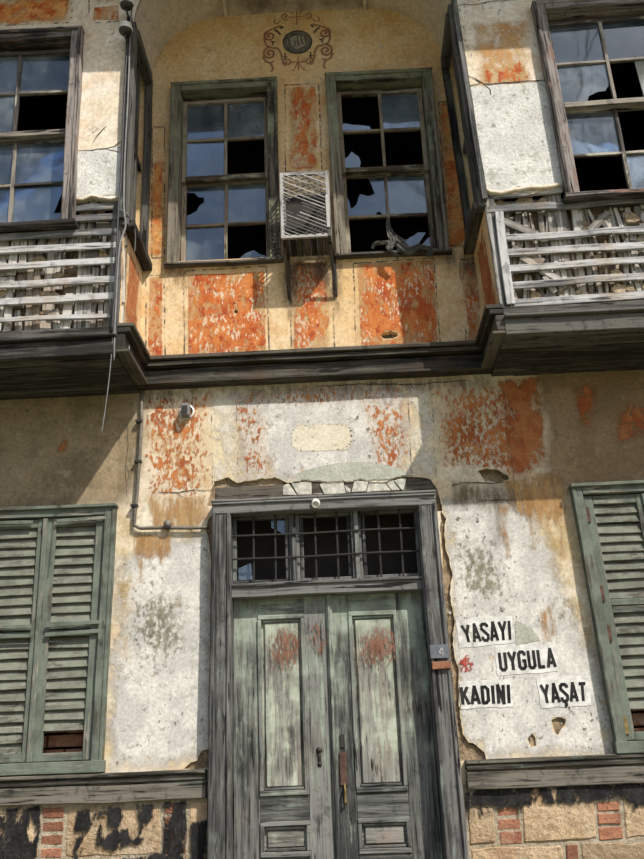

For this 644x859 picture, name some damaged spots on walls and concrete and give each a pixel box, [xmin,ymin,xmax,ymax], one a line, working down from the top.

peeling [0,0,69,24]
crack [469,76,545,95]
peeling [188,271,267,354]
peeling [358,261,438,346]
peeling [145,378,611,761]
leakage [138,598,178,655]
peeling [108,517,212,769]